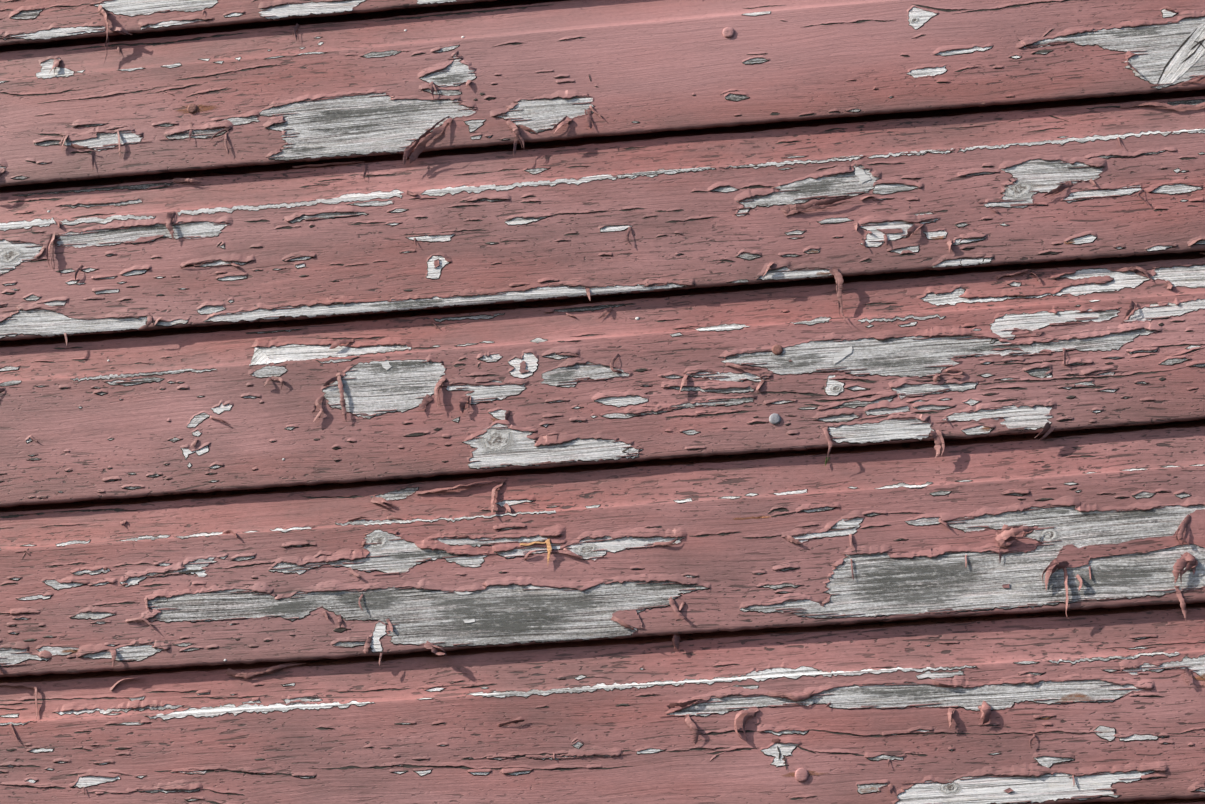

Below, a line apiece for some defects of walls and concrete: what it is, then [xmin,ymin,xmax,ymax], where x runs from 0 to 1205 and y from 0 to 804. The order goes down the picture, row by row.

peeling [0,0,367,63]
peeling [742,55,770,65]
peeling [907,5,939,30]
peeling [906,43,994,79]
peeling [1009,6,1205,110]
peeling [33,44,602,167]
peeling [724,91,750,102]
peeling [0,128,1205,674]
peeling [52,682,375,726]
peeling [465,633,1205,770]
peeling [467,740,666,776]
peeling [856,726,1169,804]